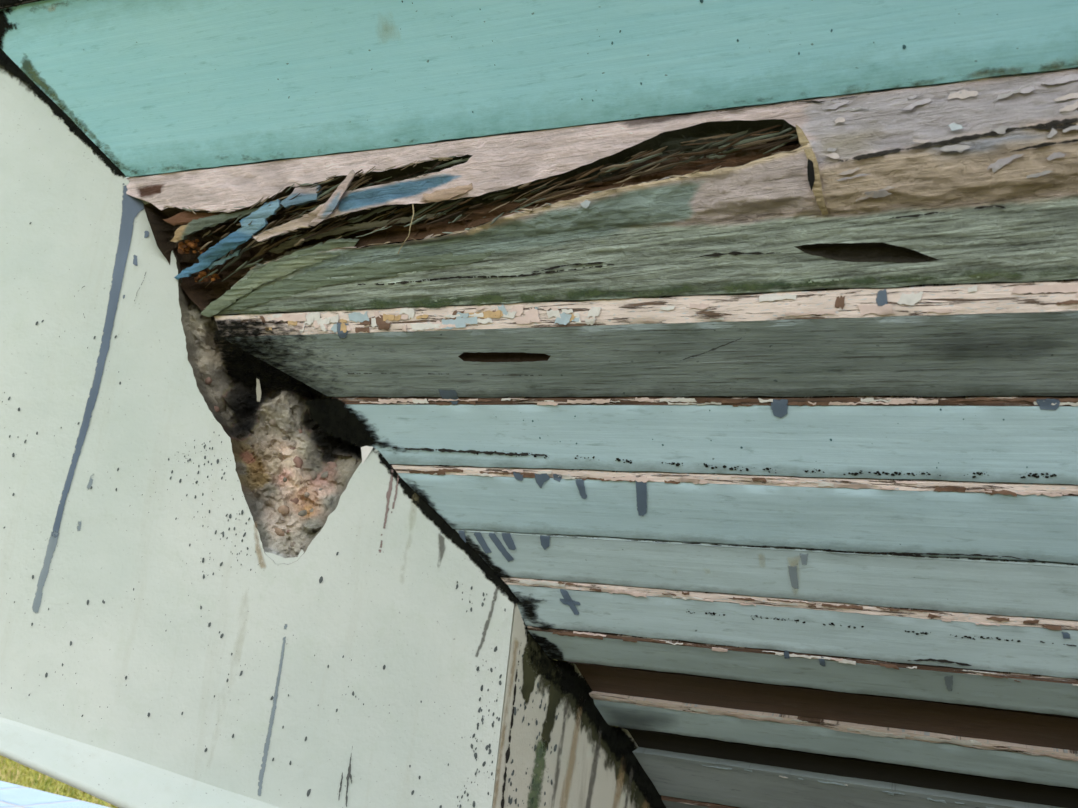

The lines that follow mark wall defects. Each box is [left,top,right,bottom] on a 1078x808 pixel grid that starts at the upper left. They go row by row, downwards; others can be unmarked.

peeling [994,74,1078,112]
peeling [1046,125,1078,138]
peeling [913,140,972,152]
crack [697,250,774,258]
crack [358,262,614,285]
peeling [759,294,797,302]
peeling [1012,284,1078,305]
peeling [260,304,602,333]
spalling [173,250,373,565]
peeling [409,468,707,484]
peeling [731,476,916,490]
peeling [934,487,1078,497]